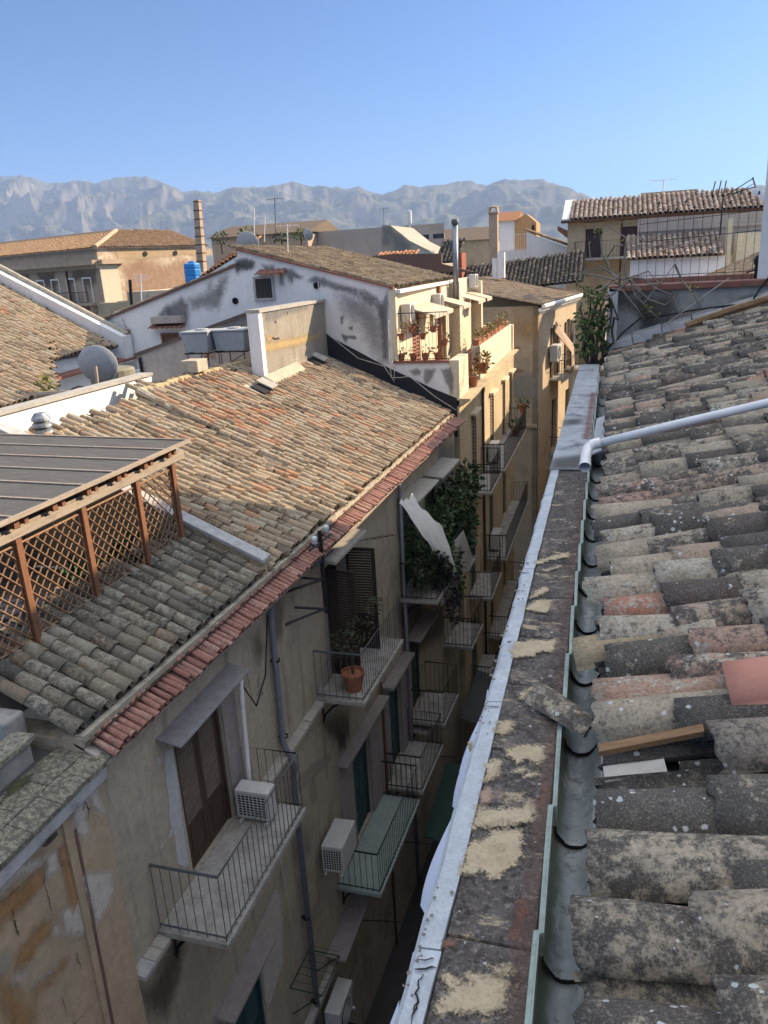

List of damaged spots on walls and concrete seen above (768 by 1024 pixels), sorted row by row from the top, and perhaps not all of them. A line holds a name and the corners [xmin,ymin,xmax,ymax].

water stain [161,279,226,319]
water stain [236,260,388,359]
crack [411,957,437,1024]